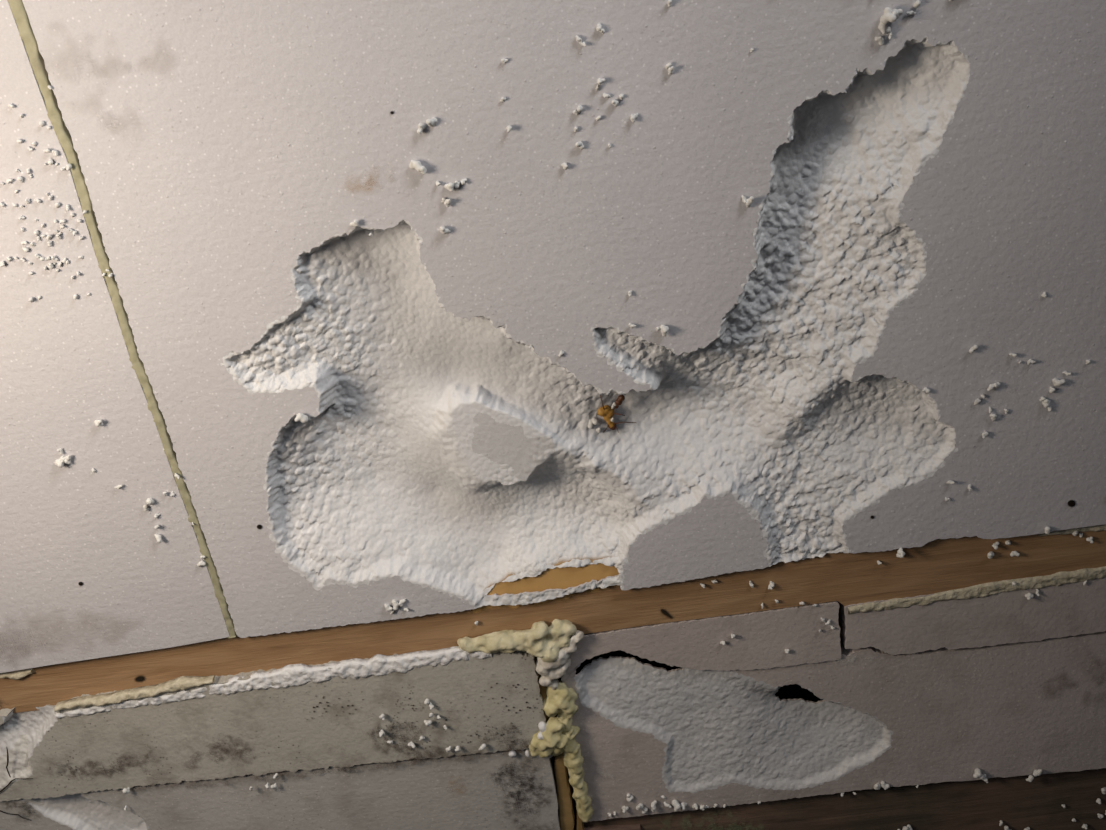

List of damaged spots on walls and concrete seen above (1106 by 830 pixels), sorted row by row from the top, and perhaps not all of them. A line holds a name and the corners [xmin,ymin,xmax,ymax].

spalling [220,36,970,613]
spalling [0,706,58,789]